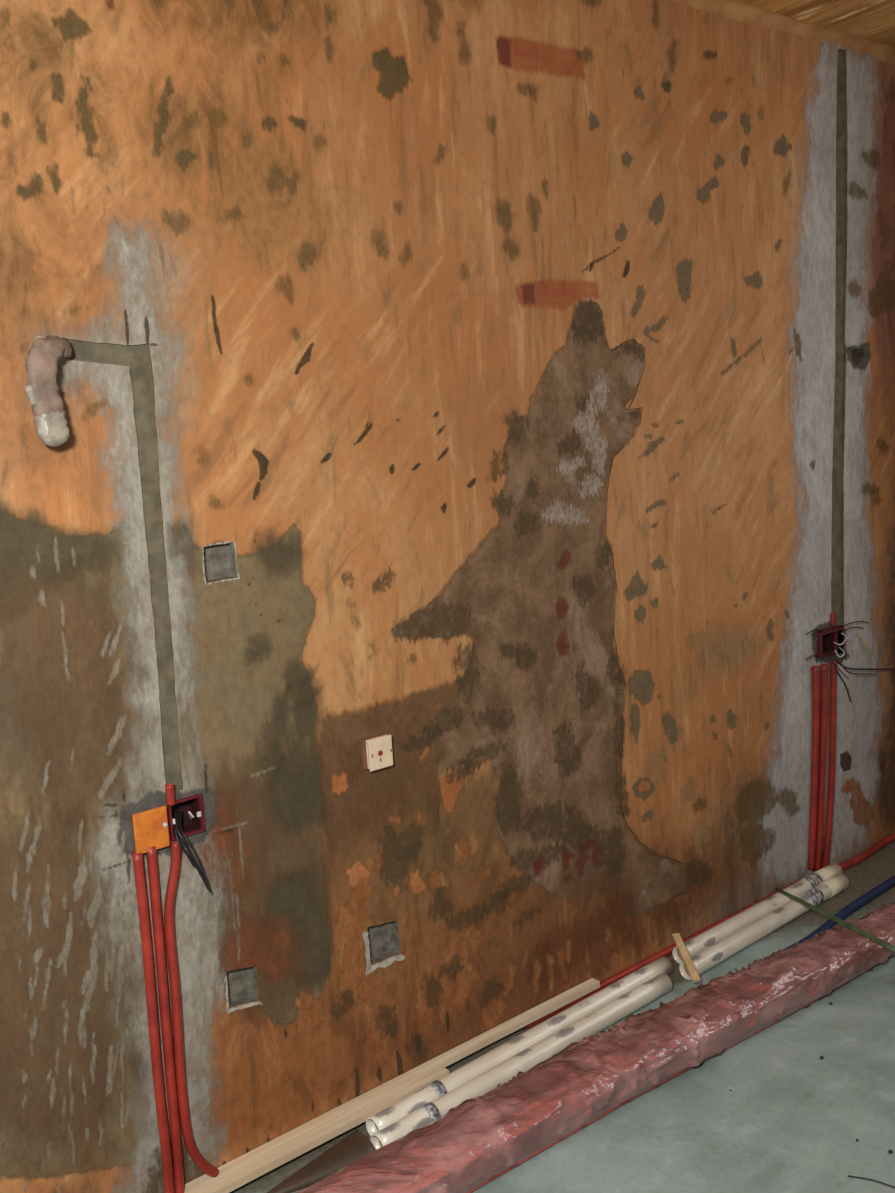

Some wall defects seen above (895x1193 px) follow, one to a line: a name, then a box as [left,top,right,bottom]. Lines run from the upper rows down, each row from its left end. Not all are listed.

leakage [53,10,91,40]
leakage [37,123,47,142]
leakage [52,73,98,158]
leakage [152,78,174,156]
leakage [290,116,306,132]
leakage [17,164,61,198]
leakage [497,201,518,258]
leakage [102,589,136,678]
leakage [99,719,124,799]
peeling [0,506,149,1179]
leakage [736,781,799,863]
leakage [12,819,130,1128]